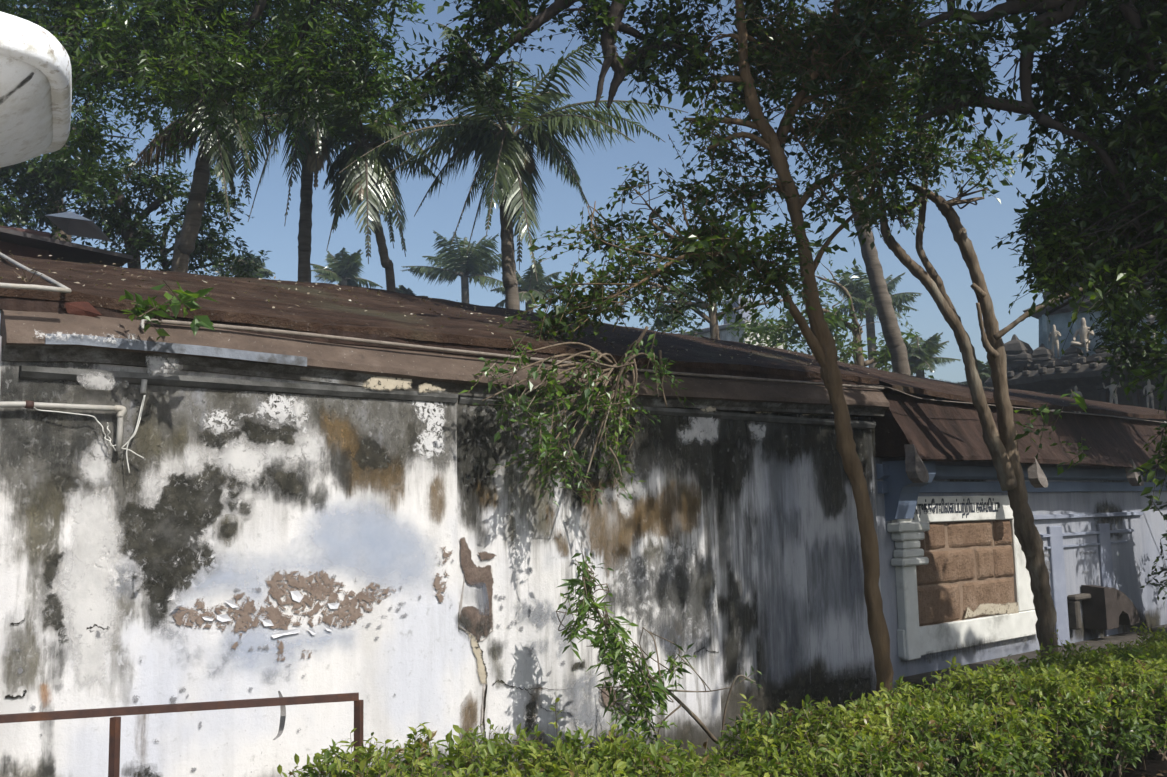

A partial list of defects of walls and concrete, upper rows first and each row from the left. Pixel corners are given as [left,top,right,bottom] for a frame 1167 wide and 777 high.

peeling [173,570,408,666]
leakage [0,361,875,777]
spalling [432,537,495,684]